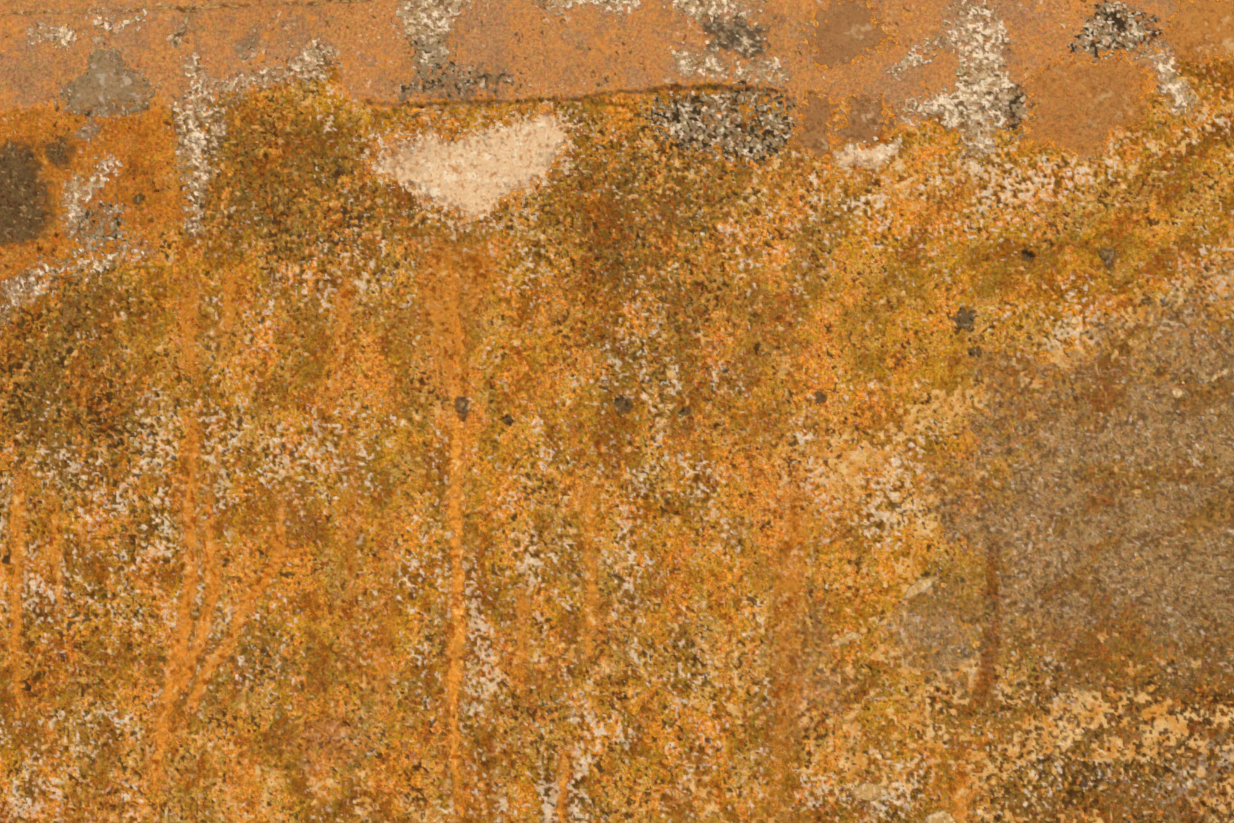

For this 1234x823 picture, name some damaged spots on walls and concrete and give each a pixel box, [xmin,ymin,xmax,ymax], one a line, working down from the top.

damp [0,137,157,333]
damp [169,35,341,243]
peeling [353,83,595,240]
damp [532,0,641,22]
damp [640,0,797,163]
damp [887,0,1041,160]
corrosion [9,478,28,719]
corrosion [46,505,67,611]
corrosion [149,421,287,791]
corrosion [426,255,487,820]
corrosion [583,487,599,659]
corrosion [952,778,968,823]